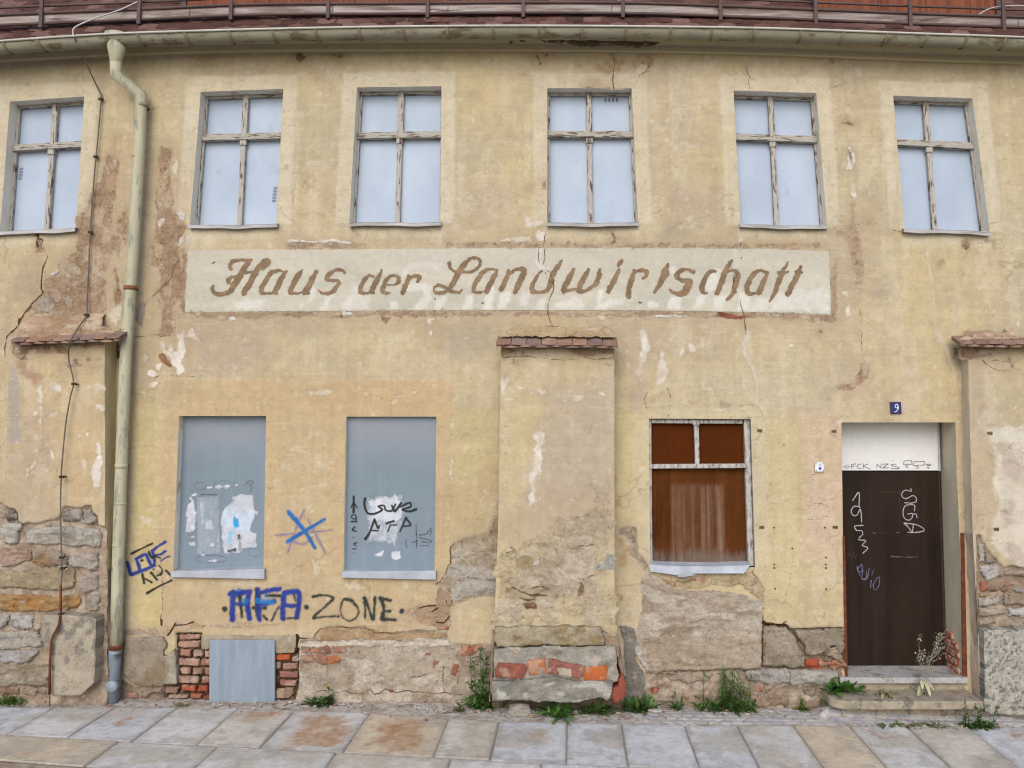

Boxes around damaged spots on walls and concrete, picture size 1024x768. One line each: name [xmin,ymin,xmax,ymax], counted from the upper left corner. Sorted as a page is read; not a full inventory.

crack [4,256,48,355]
peeling [31,155,129,328]
peeling [141,146,864,398]
crack [503,233,610,363]
peeling [527,431,547,506]
flaking render [0,502,283,705]
spalling [405,488,648,636]
spalling [662,572,764,600]
flaking render [976,535,1024,635]